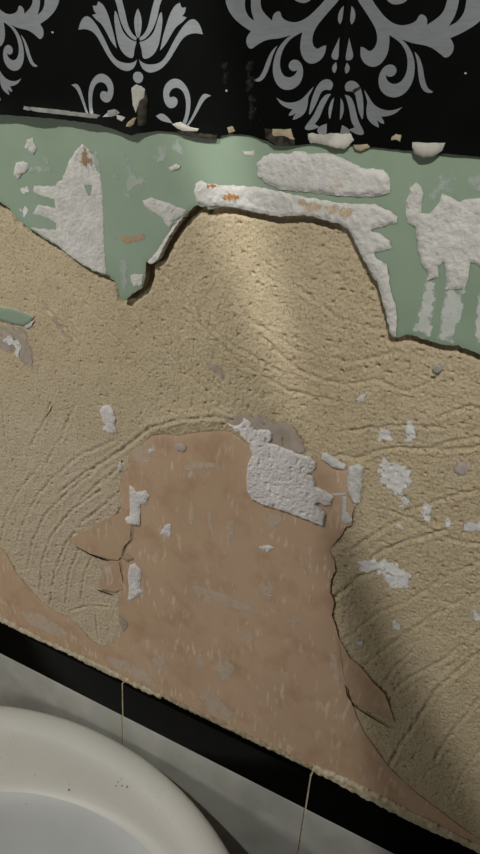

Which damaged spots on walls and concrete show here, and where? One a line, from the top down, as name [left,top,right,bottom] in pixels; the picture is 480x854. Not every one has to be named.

peeling [13,137,106,274]
flaking render [130,274,143,287]
flaking render [100,404,117,434]
crack [78,507,131,595]
flaking render [0,418,480,844]
crack [345,685,390,728]